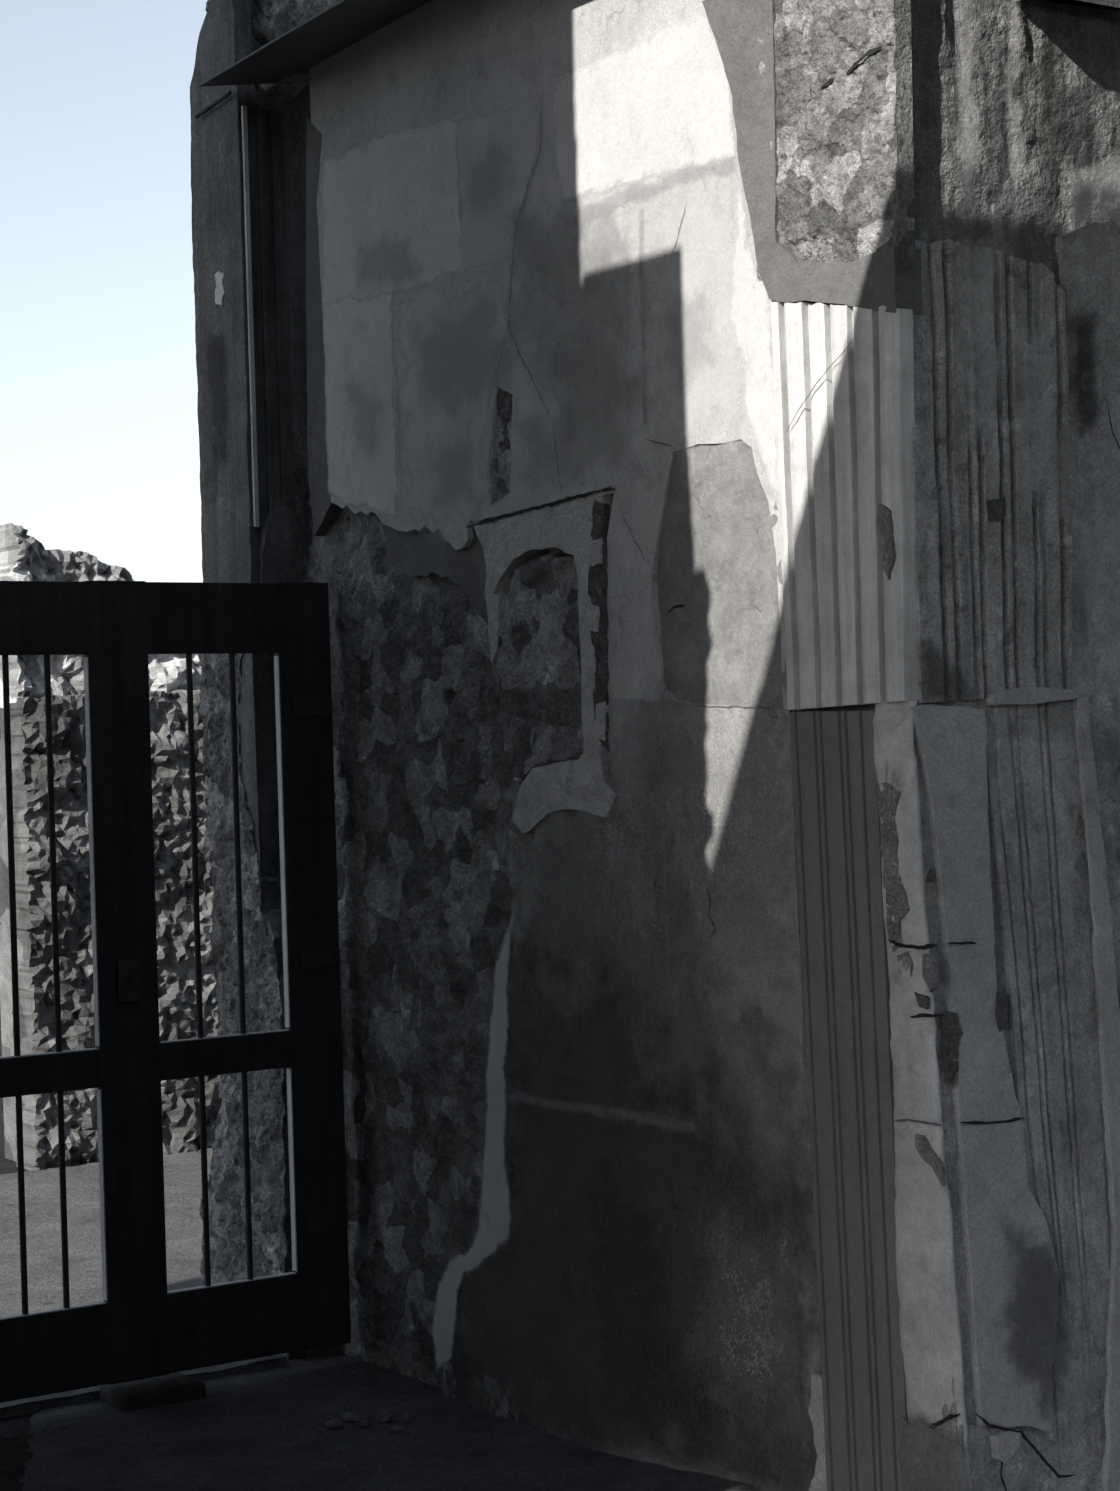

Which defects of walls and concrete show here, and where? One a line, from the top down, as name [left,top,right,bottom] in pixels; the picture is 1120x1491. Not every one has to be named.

spalling [489,388,513,504]
spalling [585,499,610,752]
crack [903,1413,1076,1491]